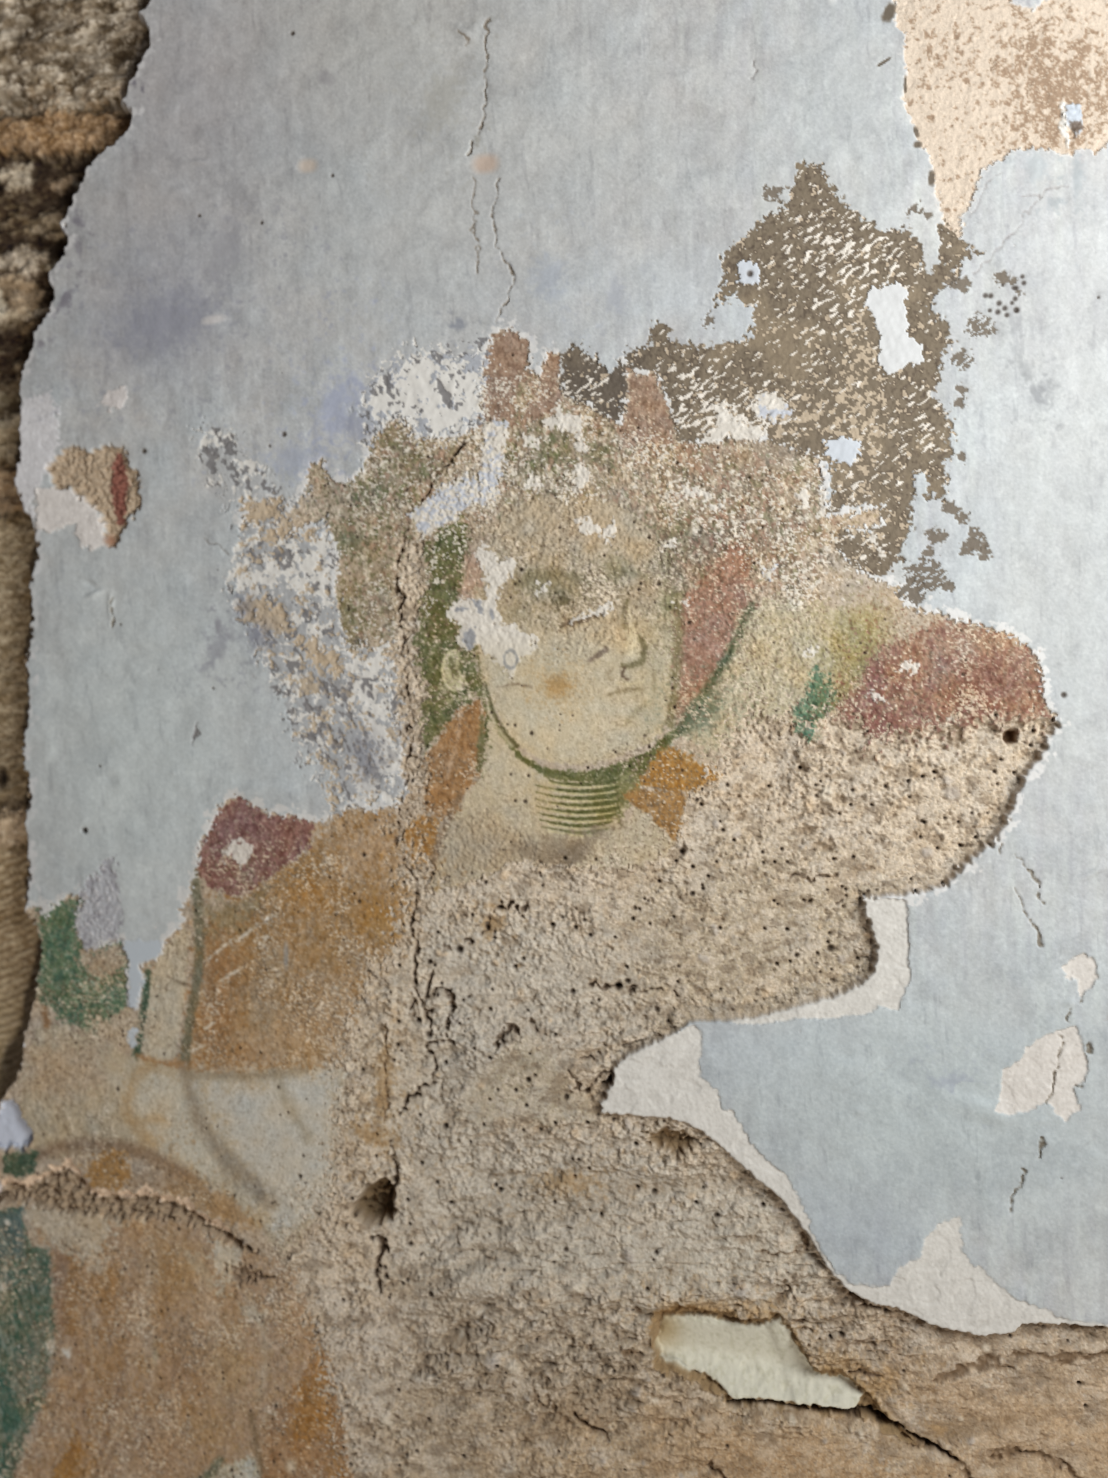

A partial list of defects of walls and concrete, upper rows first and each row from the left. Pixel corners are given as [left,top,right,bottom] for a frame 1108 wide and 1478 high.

peeling [522,0,1108,608]
peeling [101,386,128,409]
peeling [34,446,142,552]
peeling [75,858,124,954]
flaking render [193,338,1108,1478]
crack [384,901,528,1111]
crack [493,1018,535,1048]
crack [574,1056,614,1093]
crack [0,1158,253,1253]
crack [374,1234,390,1291]
crack [731,1340,1080,1478]
crack [932,1349,1108,1383]